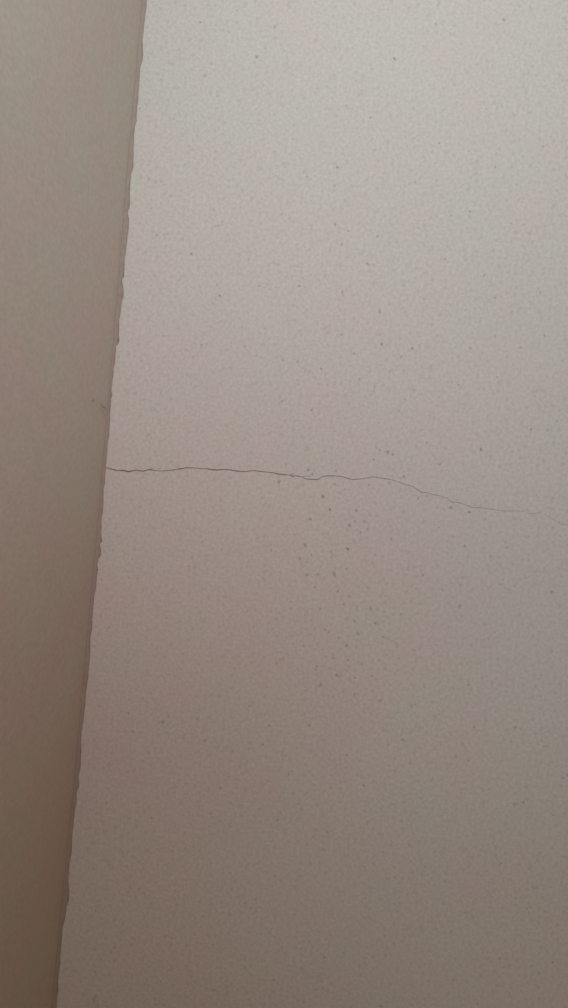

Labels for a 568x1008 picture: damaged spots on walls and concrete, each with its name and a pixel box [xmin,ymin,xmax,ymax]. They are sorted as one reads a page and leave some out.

crack [52,0,504,1008]